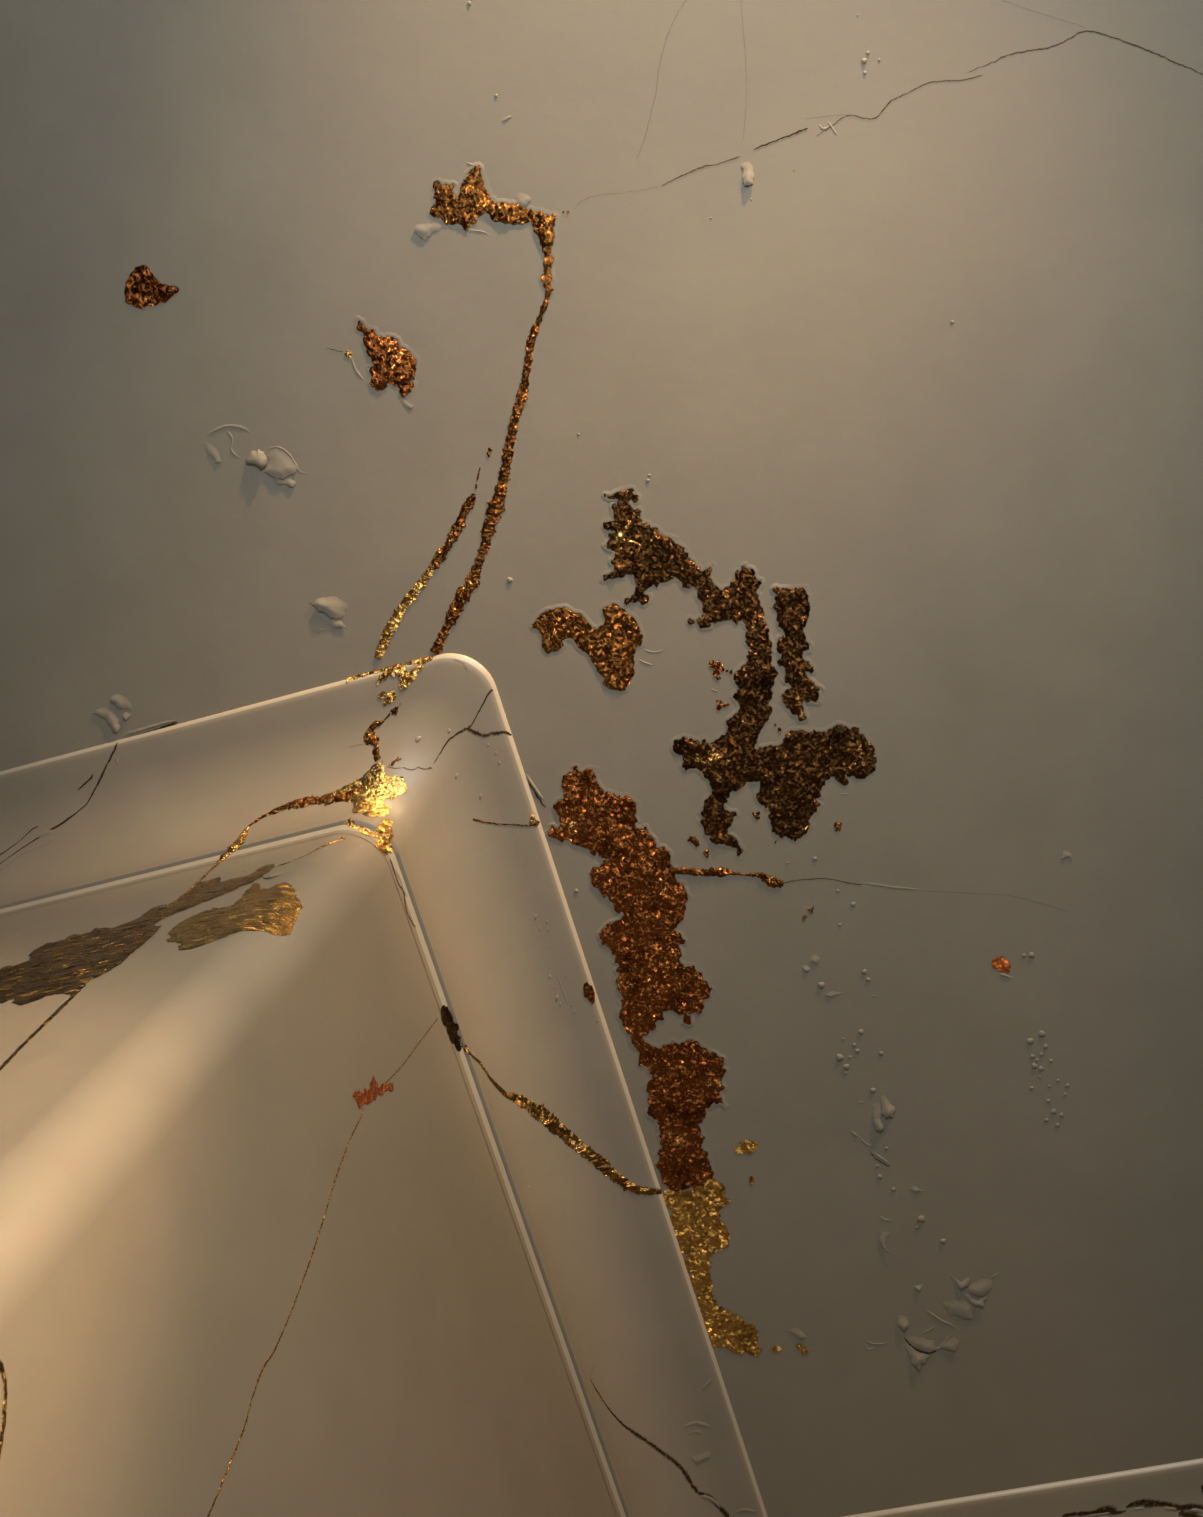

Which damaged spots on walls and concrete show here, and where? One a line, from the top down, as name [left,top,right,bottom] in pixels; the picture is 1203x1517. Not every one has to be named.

crack [662,30,1203,186]
peeling [204,424,307,487]
peeling [309,596,348,633]
crack [174,288,572,927]
peeling [92,694,132,733]
crack [0,720,178,864]
crack [673,866,924,891]
crack [0,990,81,1070]
crack [207,1005,662,1517]
peeling [864,1273,999,1370]
crack [0,1360,8,1457]
crack [1062,1485,1203,1517]